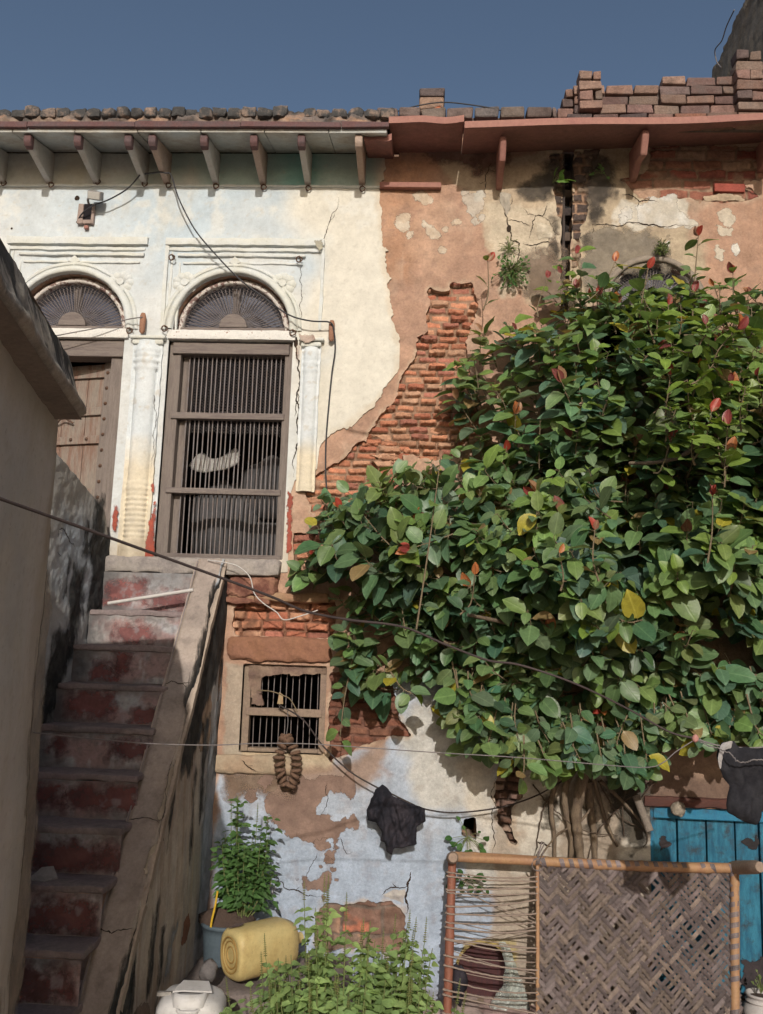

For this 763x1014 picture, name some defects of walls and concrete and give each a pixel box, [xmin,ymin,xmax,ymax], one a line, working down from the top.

peeling [394,190,486,254]
crack [480,165,557,266]
damp [517,160,561,201]
flaking render [618,145,763,261]
flaking render [306,283,479,526]
flaking render [286,491,323,573]
damp [8,495,110,1014]
flaking render [328,672,411,762]
flaking render [494,758,523,843]
peeling [244,771,406,953]
crack [382,872,411,914]